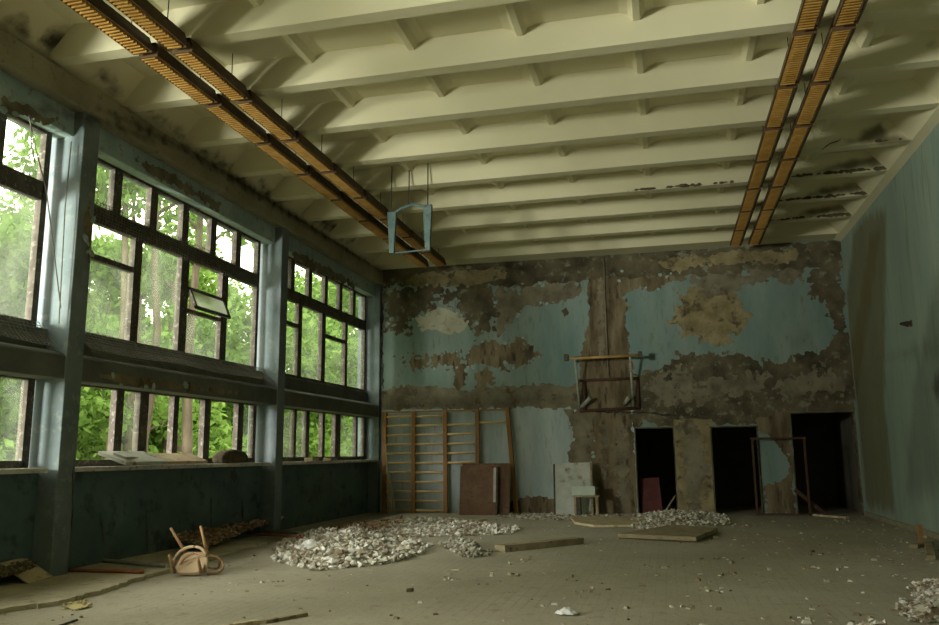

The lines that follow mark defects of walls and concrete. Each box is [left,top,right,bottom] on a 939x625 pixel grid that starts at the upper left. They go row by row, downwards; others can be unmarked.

leakage [860,125,902,143]
leakage [791,159,887,178]
leakage [771,184,867,221]
spalling [381,248,855,514]